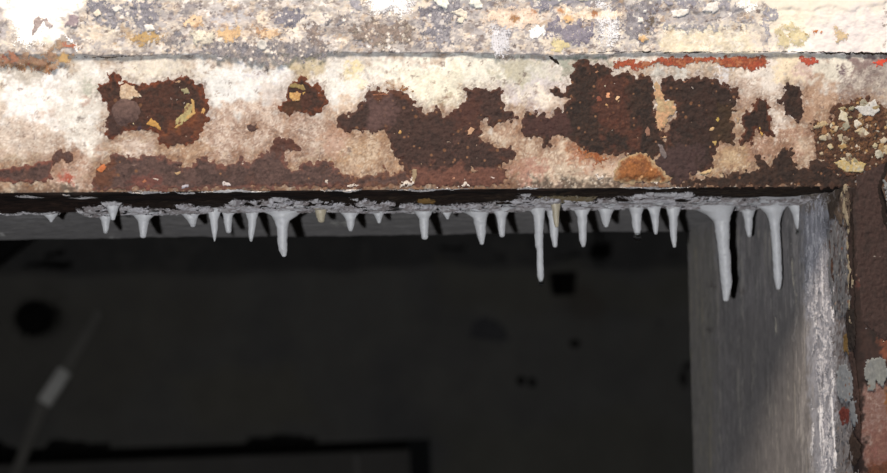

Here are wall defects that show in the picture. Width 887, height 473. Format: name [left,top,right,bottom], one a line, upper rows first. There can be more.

spalling [32,16,53,36]
spalling [65,0,483,67]
spalling [529,0,782,49]
rust [0,149,73,185]
rust [91,59,887,466]
damp [64,179,839,473]
peeling [825,184,859,473]
peeling [864,357,887,391]